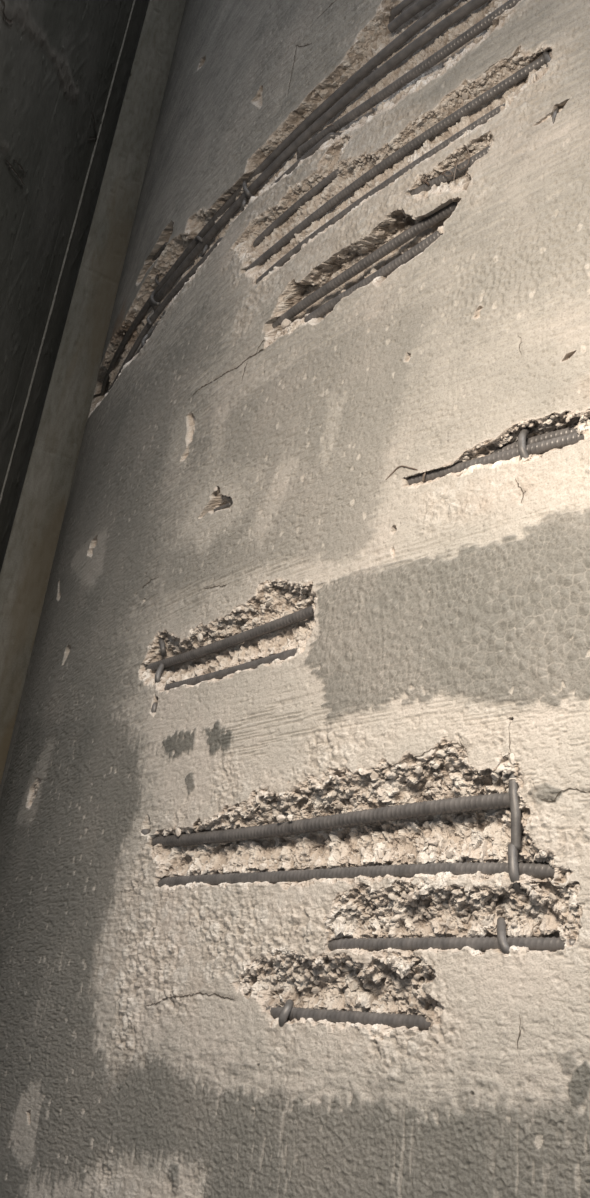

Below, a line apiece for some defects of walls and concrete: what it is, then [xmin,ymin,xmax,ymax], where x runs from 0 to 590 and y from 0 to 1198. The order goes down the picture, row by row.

spalling [88,0,553,418]
spalling [532,97,572,127]
peeling [181,473,245,550]
peeling [375,294,590,564]
peeling [93,578,590,1116]
crack [146,992,234,1007]